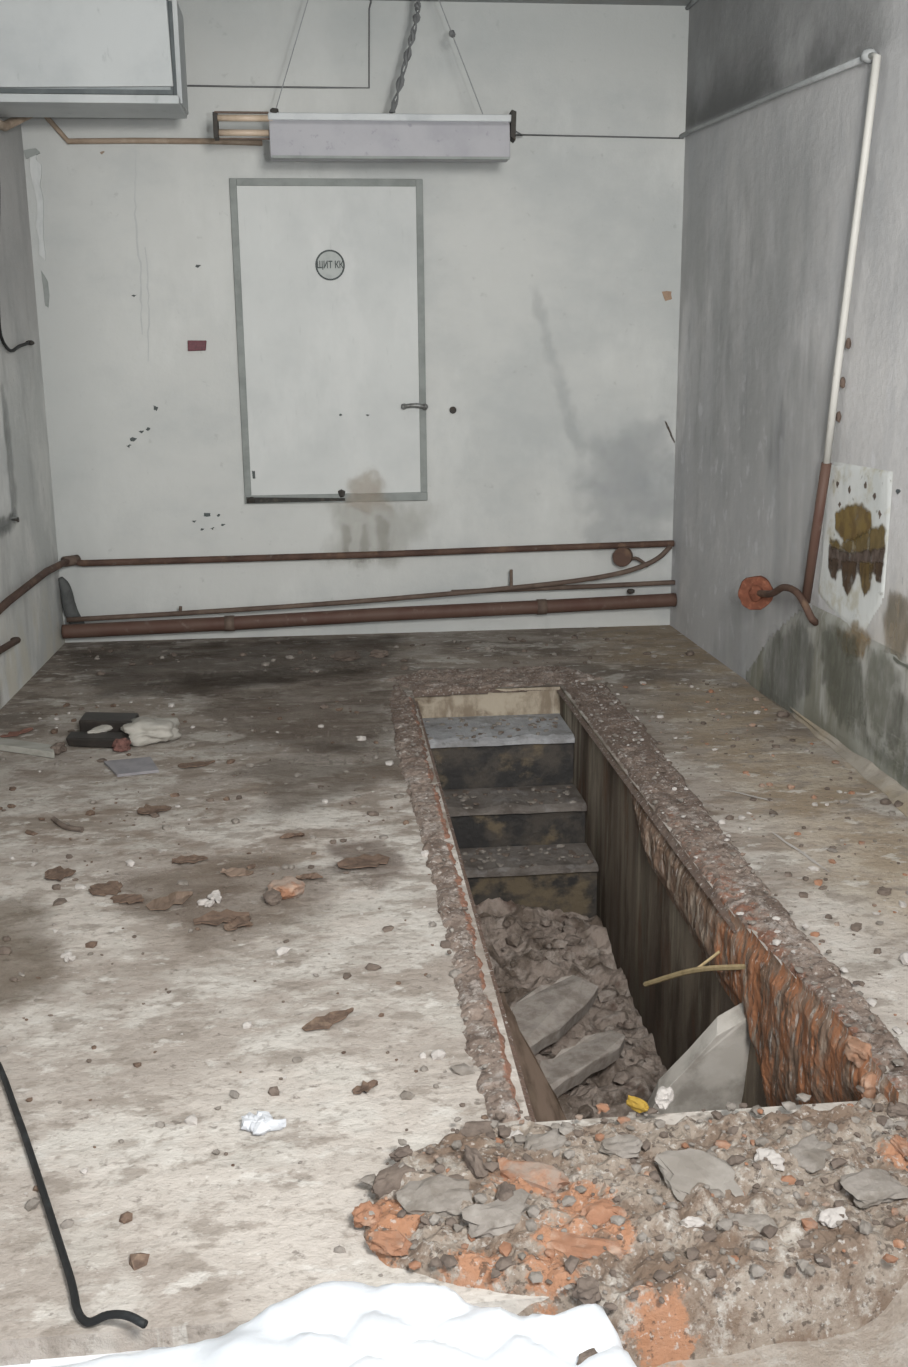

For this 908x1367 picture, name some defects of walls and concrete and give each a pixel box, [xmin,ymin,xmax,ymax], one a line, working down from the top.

leakage [885,595,908,656]
spalling [352,666,908,1367]